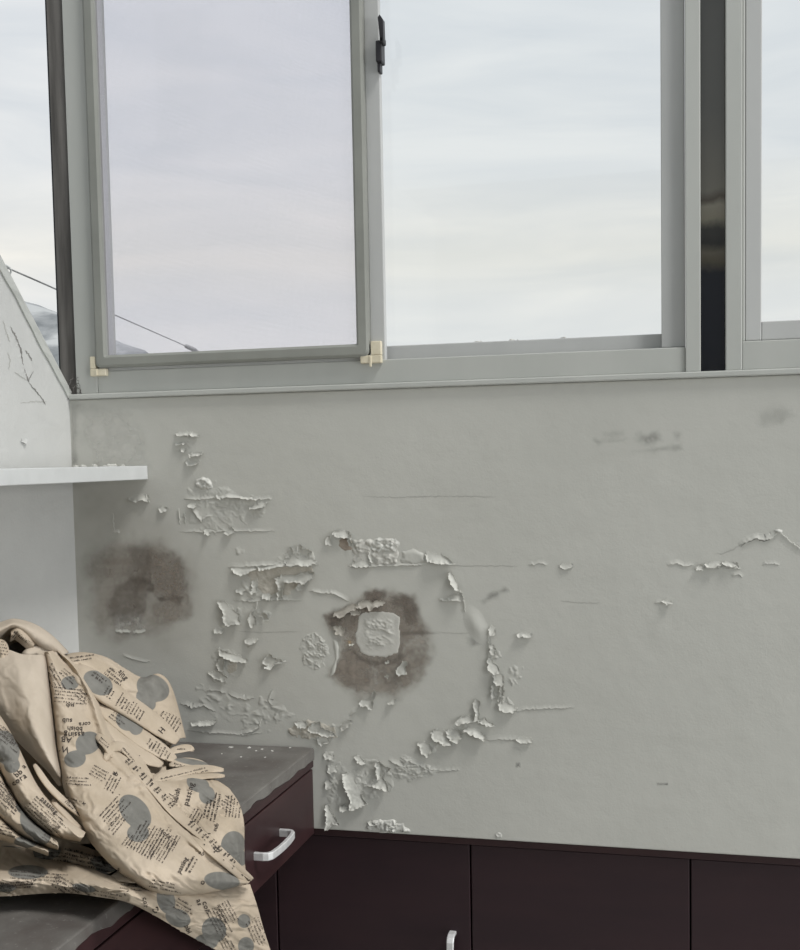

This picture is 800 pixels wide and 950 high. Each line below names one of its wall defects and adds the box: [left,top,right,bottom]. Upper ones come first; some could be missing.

crack [3,322,45,404]
peeling [128,431,276,536]
peeling [208,544,320,685]
damp [309,587,426,693]
spalling [325,530,549,614]
peeling [666,559,745,578]
peeling [288,625,574,833]